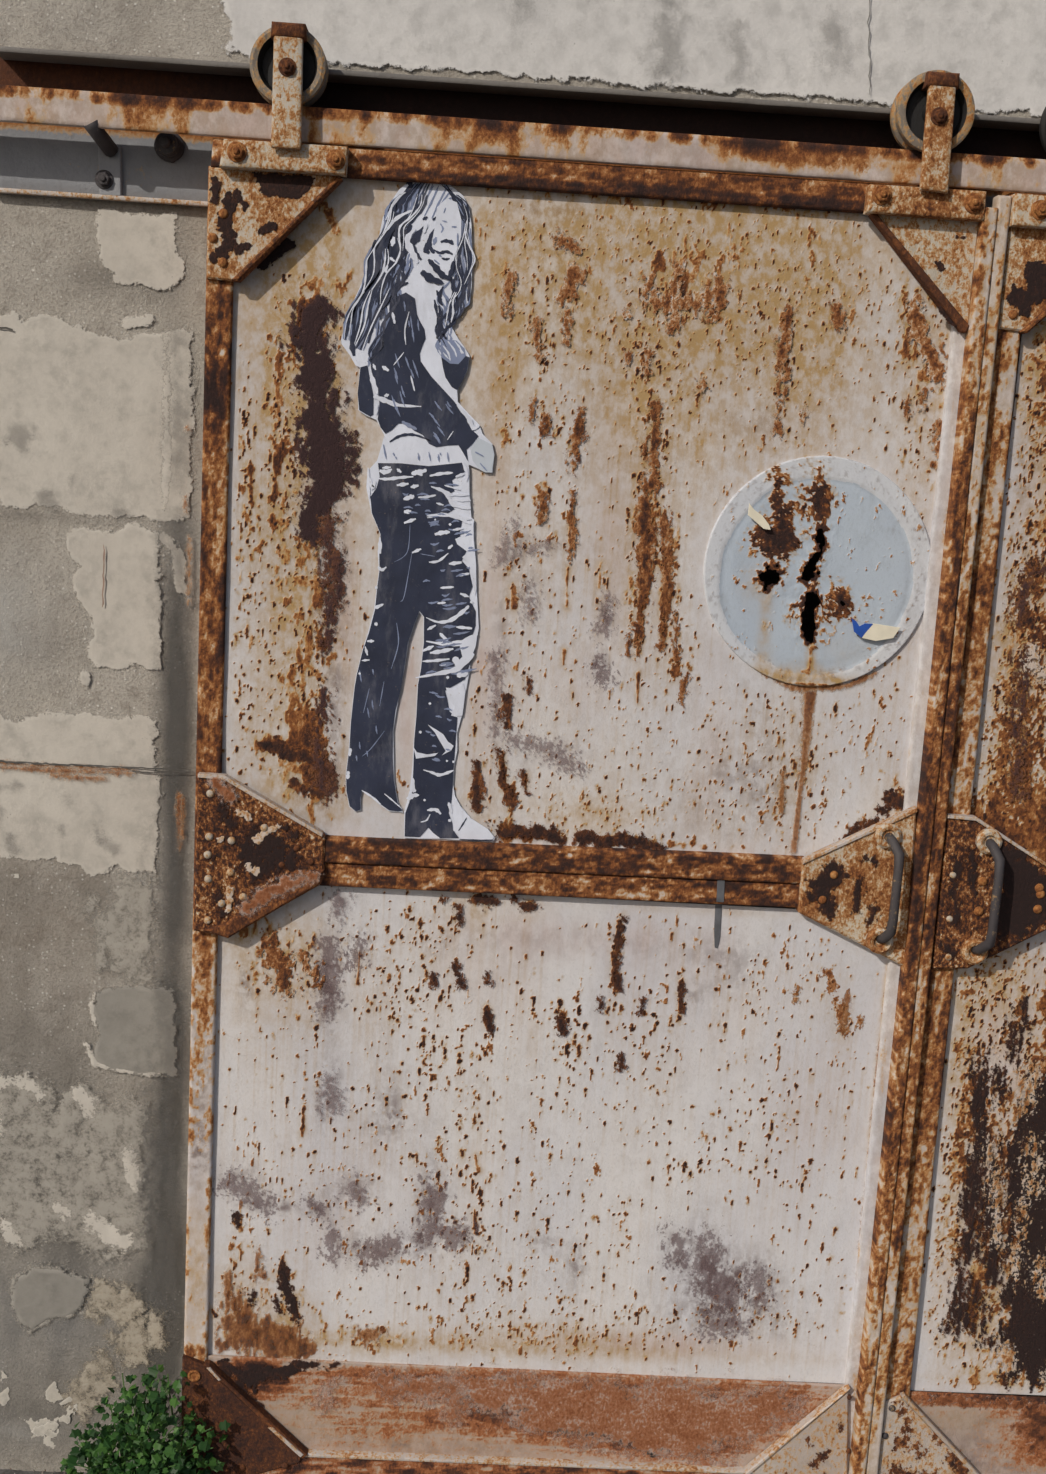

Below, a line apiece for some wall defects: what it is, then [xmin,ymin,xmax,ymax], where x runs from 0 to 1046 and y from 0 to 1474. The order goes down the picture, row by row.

flaking render [220,0,1046,117]
crack [865,0,873,95]
flaking render [95,208,185,291]
corrosion [209,172,315,270]
flaking render [0,310,196,687]
corrosion [257,292,362,807]
corrosion [619,397,693,713]
corrosion [466,675,667,850]
corrosion [802,786,905,930]
flaking render [0,710,179,1449]
corrosion [885,995,1046,1474]
corrosion [215,1247,346,1414]